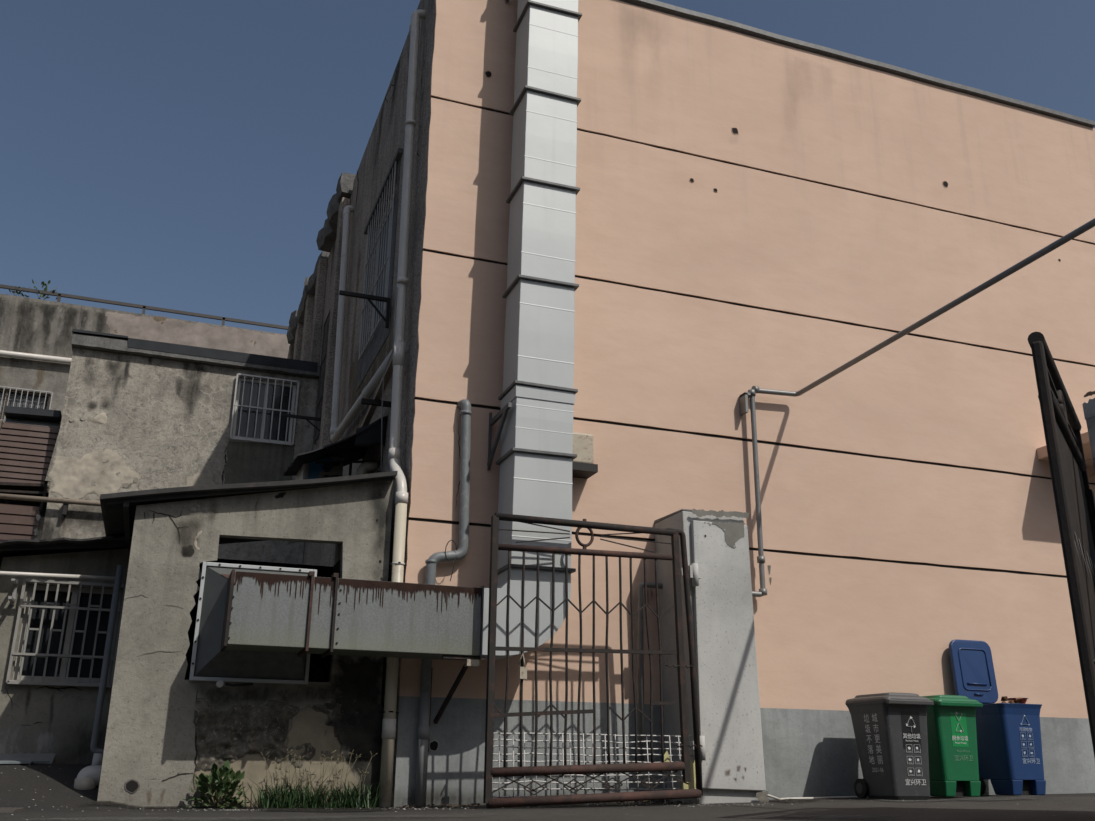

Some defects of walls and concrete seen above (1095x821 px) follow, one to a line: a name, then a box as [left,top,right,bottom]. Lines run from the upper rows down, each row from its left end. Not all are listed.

leakage [16,304,104,348]
crack [144,510,182,543]
peeling [692,509,749,548]
rust [221,571,482,614]
spalling [194,698,335,771]